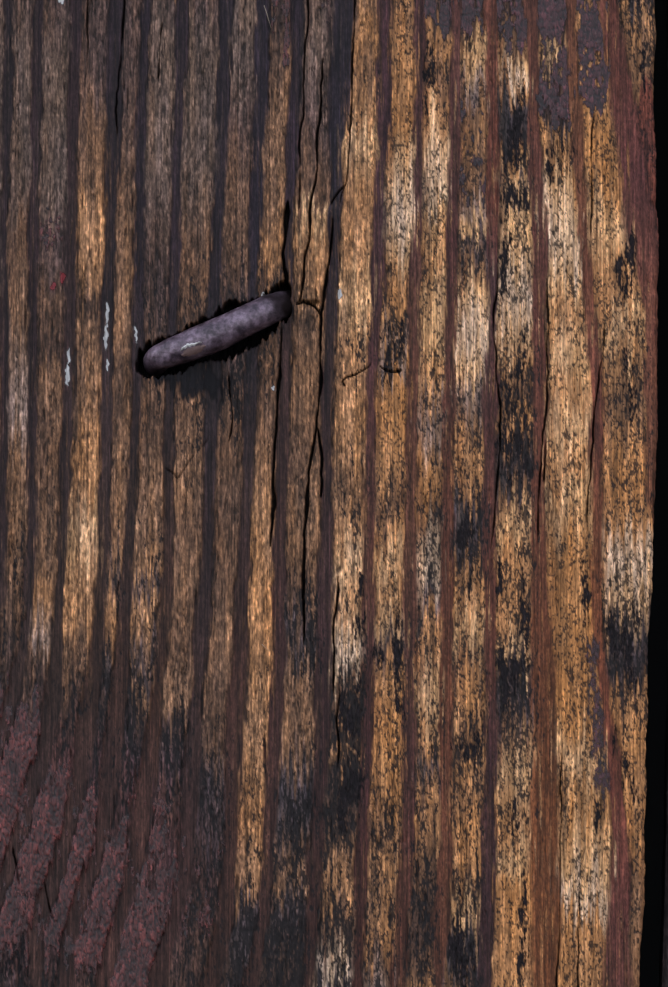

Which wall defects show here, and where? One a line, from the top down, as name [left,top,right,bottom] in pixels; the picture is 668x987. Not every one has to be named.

peeling [424,0,485,41]
peeling [497,0,612,133]
crack [282,0,401,637]
crack [270,338,282,546]
crack [332,580,340,763]
peeling [0,672,219,987]